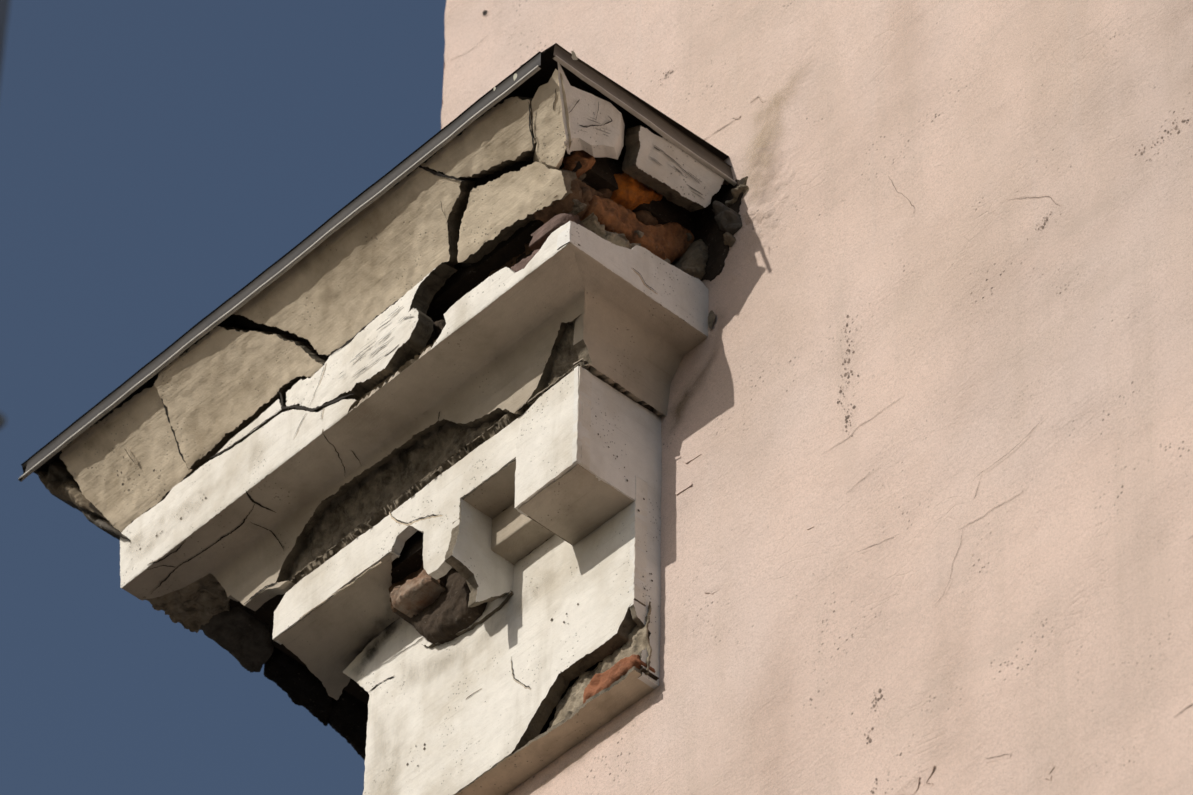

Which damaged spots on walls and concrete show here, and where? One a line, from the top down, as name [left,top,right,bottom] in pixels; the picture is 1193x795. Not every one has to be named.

crack [419,88,612,223]
flaking render [488,145,749,281]
crack [631,268,658,294]
crack [161,279,423,477]
crack [518,378,559,411]
flaking render [541,322,587,396]
crack [147,491,286,594]
flaking render [143,574,368,760]
flaking render [287,412,518,589]
crack [389,512,442,526]
flaking render [389,563,488,646]
flaking render [547,573,659,730]